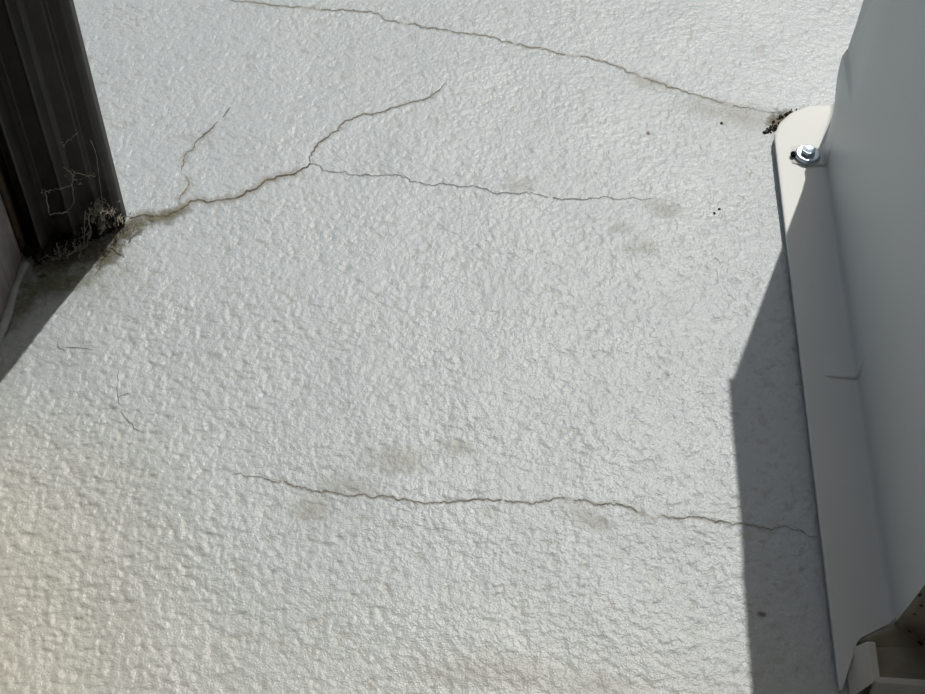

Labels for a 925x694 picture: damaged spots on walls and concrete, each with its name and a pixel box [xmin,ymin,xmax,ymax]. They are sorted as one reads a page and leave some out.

crack [95,83,652,275]
water stain [33,222,142,283]
crack [238,473,635,510]